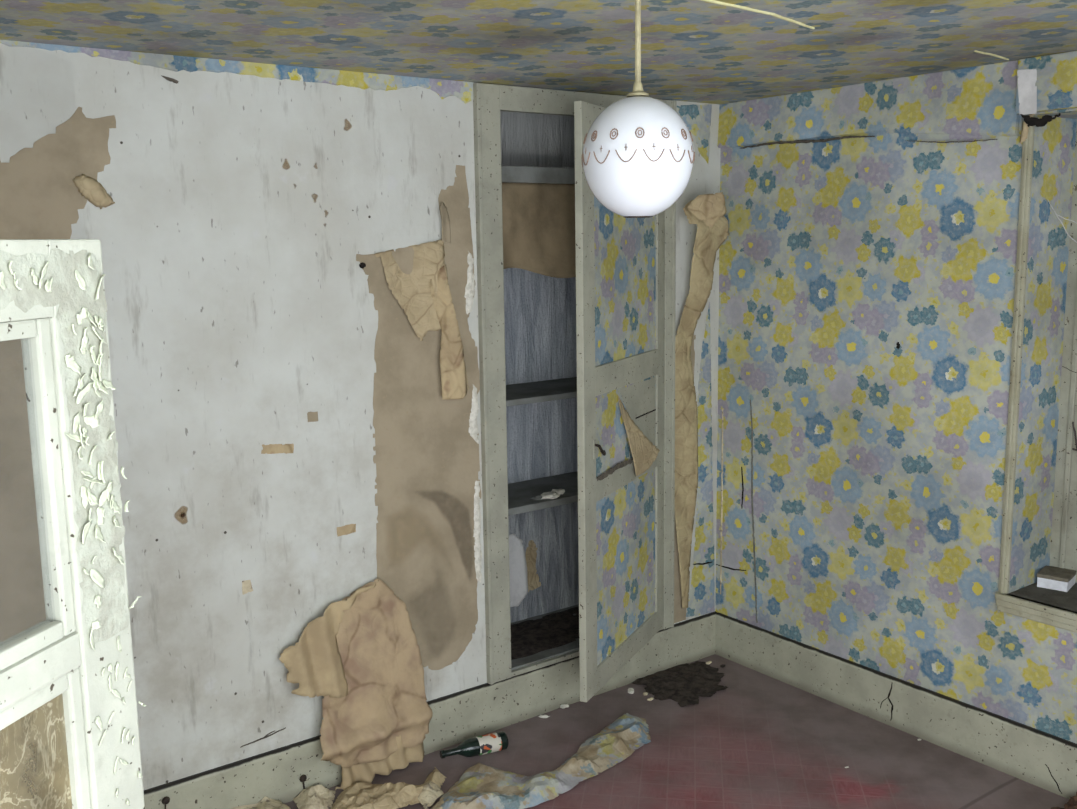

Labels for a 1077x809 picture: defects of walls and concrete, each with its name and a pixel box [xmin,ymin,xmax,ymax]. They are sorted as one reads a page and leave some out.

peeling [0,107,147,746]
peeling [356,165,482,670]
crack [880,684,893,721]